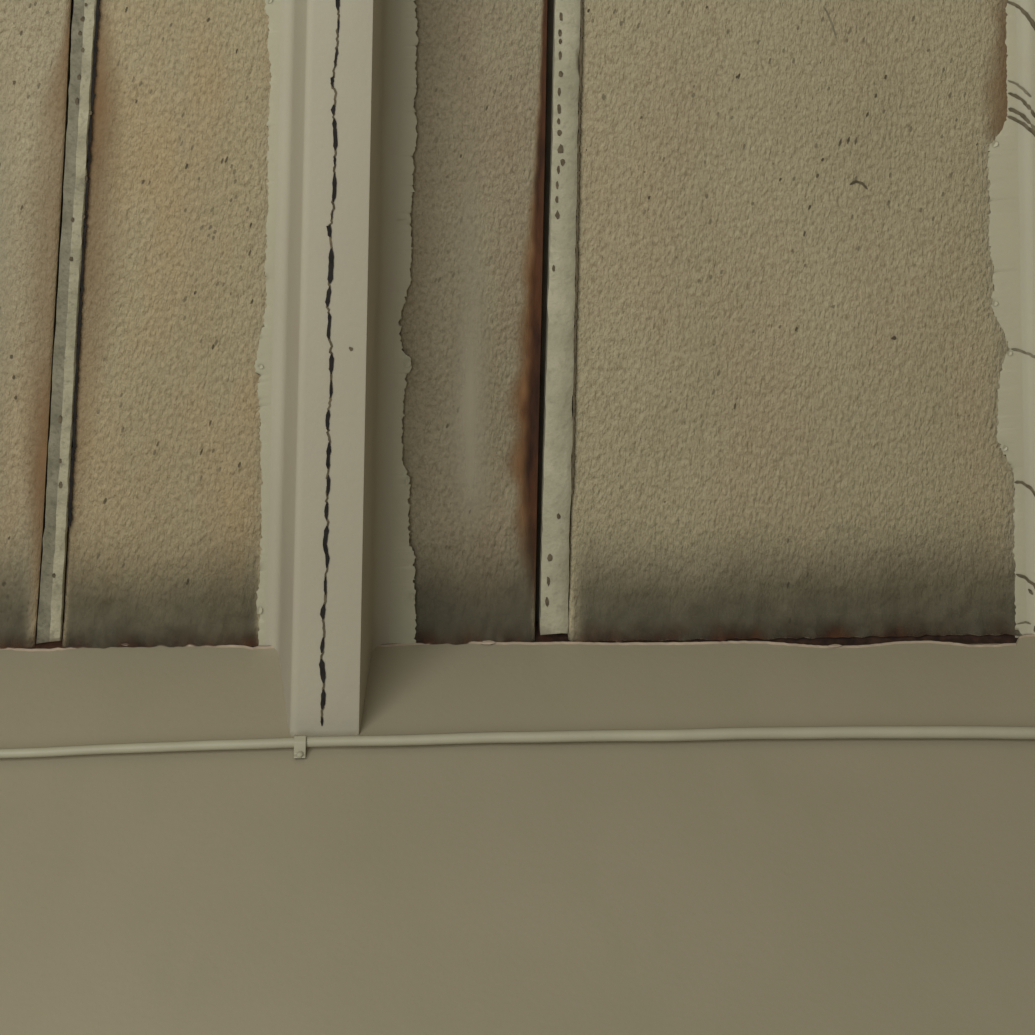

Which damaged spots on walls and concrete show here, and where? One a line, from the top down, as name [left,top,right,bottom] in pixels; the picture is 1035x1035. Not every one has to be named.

crack [1007,1,1035,30]
crack [1007,80,1035,137]
rust [513,0,547,571]
peeling [0,0,294,748]
crack [319,0,340,726]
peeling [359,0,1035,735]
crack [1014,480,1035,496]
leakage [0,598,26,648]
leakage [67,591,255,649]
leakage [414,585,532,645]
leakage [580,582,1021,642]
crack [1016,574,1035,595]